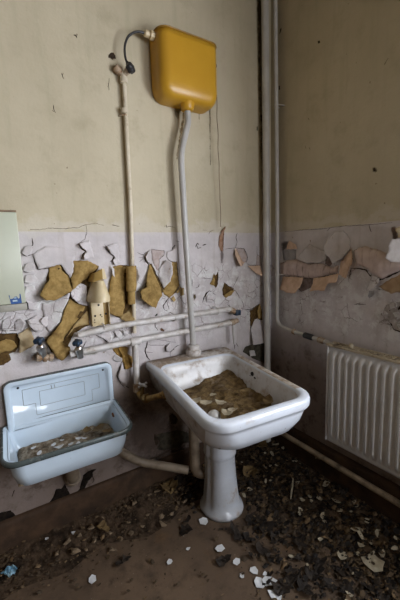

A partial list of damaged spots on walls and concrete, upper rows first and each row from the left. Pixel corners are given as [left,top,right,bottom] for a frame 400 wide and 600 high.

peeling [0,234,99,365]
peeling [105,241,184,326]
peeling [279,231,354,294]
peeling [385,226,400,262]
peeling [96,330,133,388]
peeling [243,304,264,363]
flaking render [0,510,16,522]
flaking render [50,484,70,502]
flaking render [78,469,96,491]